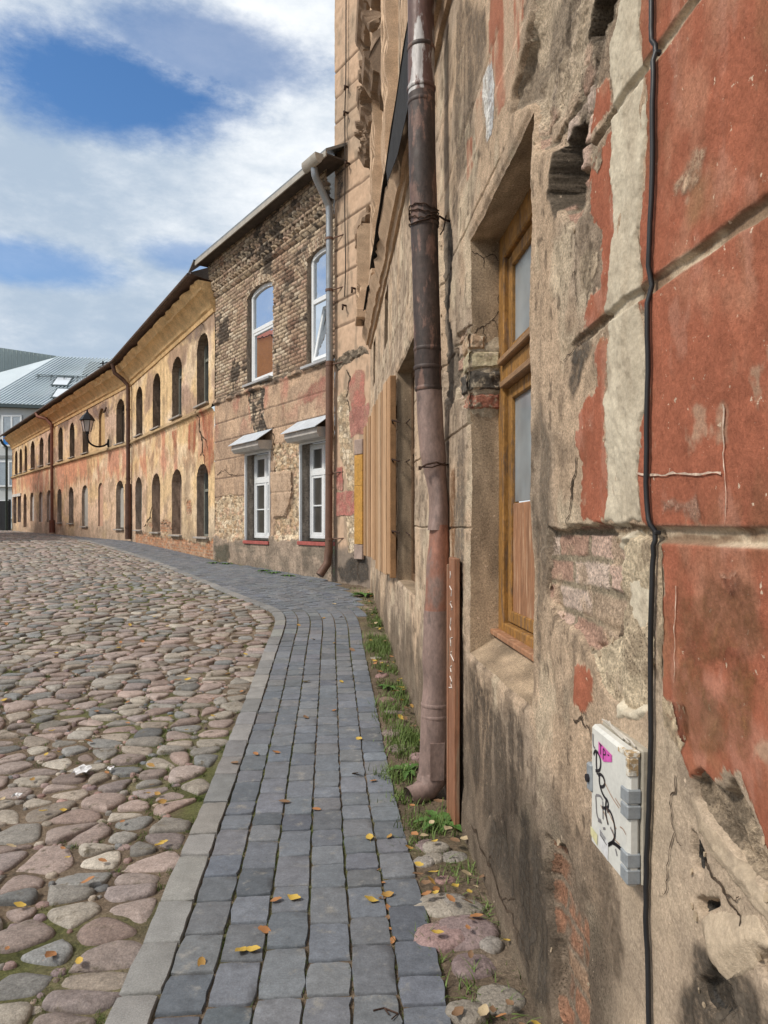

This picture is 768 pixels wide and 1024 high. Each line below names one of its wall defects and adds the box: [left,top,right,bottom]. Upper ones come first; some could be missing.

flaking render [516,0,620,234]
flaking render [247,388,268,433]
flaking render [335,346,369,553]
flaking render [549,524,664,715]
peeling [662,695,686,752]
damp [469,672,549,1003]
crack [663,777,682,916]
flaking render [690,839,707,875]
hole [690,900,721,922]
crack [705,859,741,926]
flaking render [699,771,768,903]